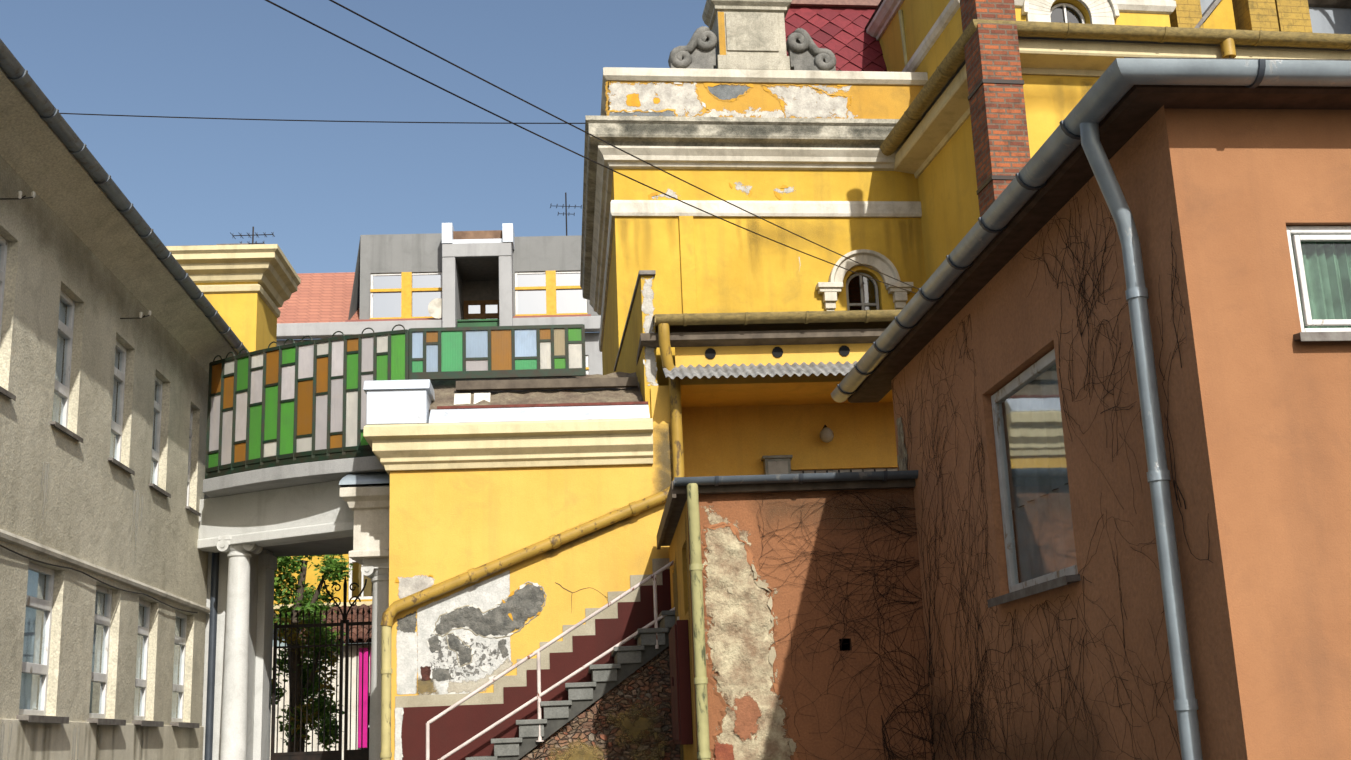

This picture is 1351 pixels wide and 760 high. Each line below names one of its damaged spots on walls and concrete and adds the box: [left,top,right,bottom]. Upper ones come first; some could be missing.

peeling [605,81,858,119]
peeling [648,189,680,200]
peeling [729,182,752,197]
peeling [774,185,794,200]
flaking render [701,506,799,760]
flaking render [394,558,670,760]